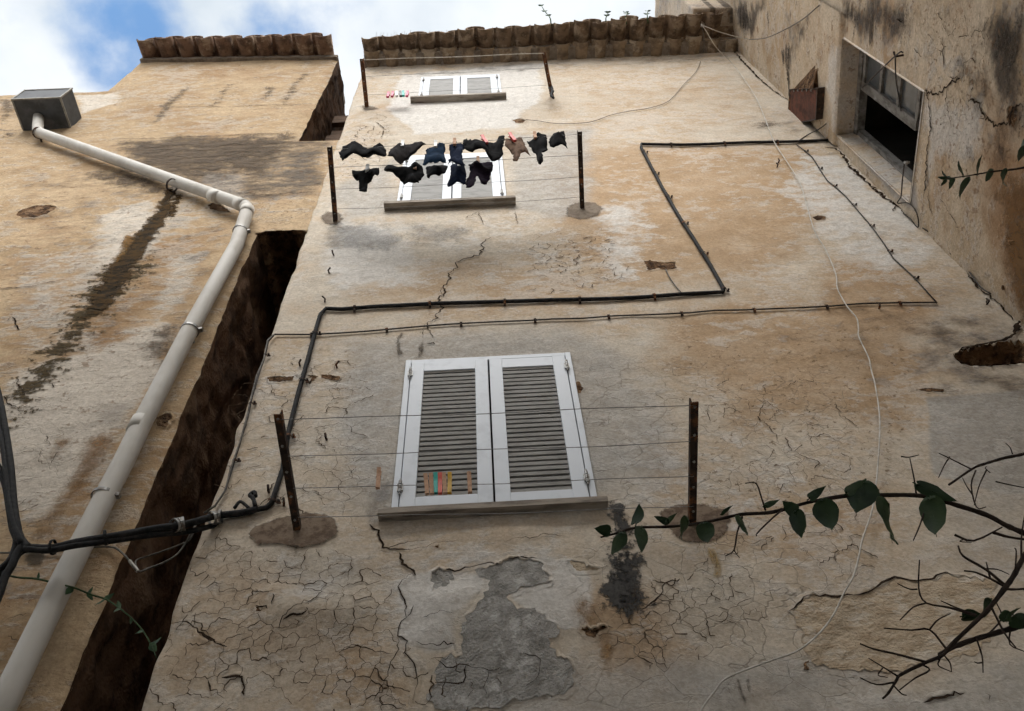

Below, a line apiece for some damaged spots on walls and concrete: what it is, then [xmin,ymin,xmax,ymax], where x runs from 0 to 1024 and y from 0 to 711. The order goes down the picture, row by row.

spalling [12,204,59,220]
leakage [167,194,184,220]
leakage [118,132,295,177]
crack [825,13,1024,223]
crack [422,213,492,344]
leakage [146,322,182,361]
spalling [947,321,1024,370]
crack [139,356,502,711]
mould [598,500,656,619]
crack [591,372,878,668]
flaking render [422,554,580,711]
flaking render [780,568,1005,682]